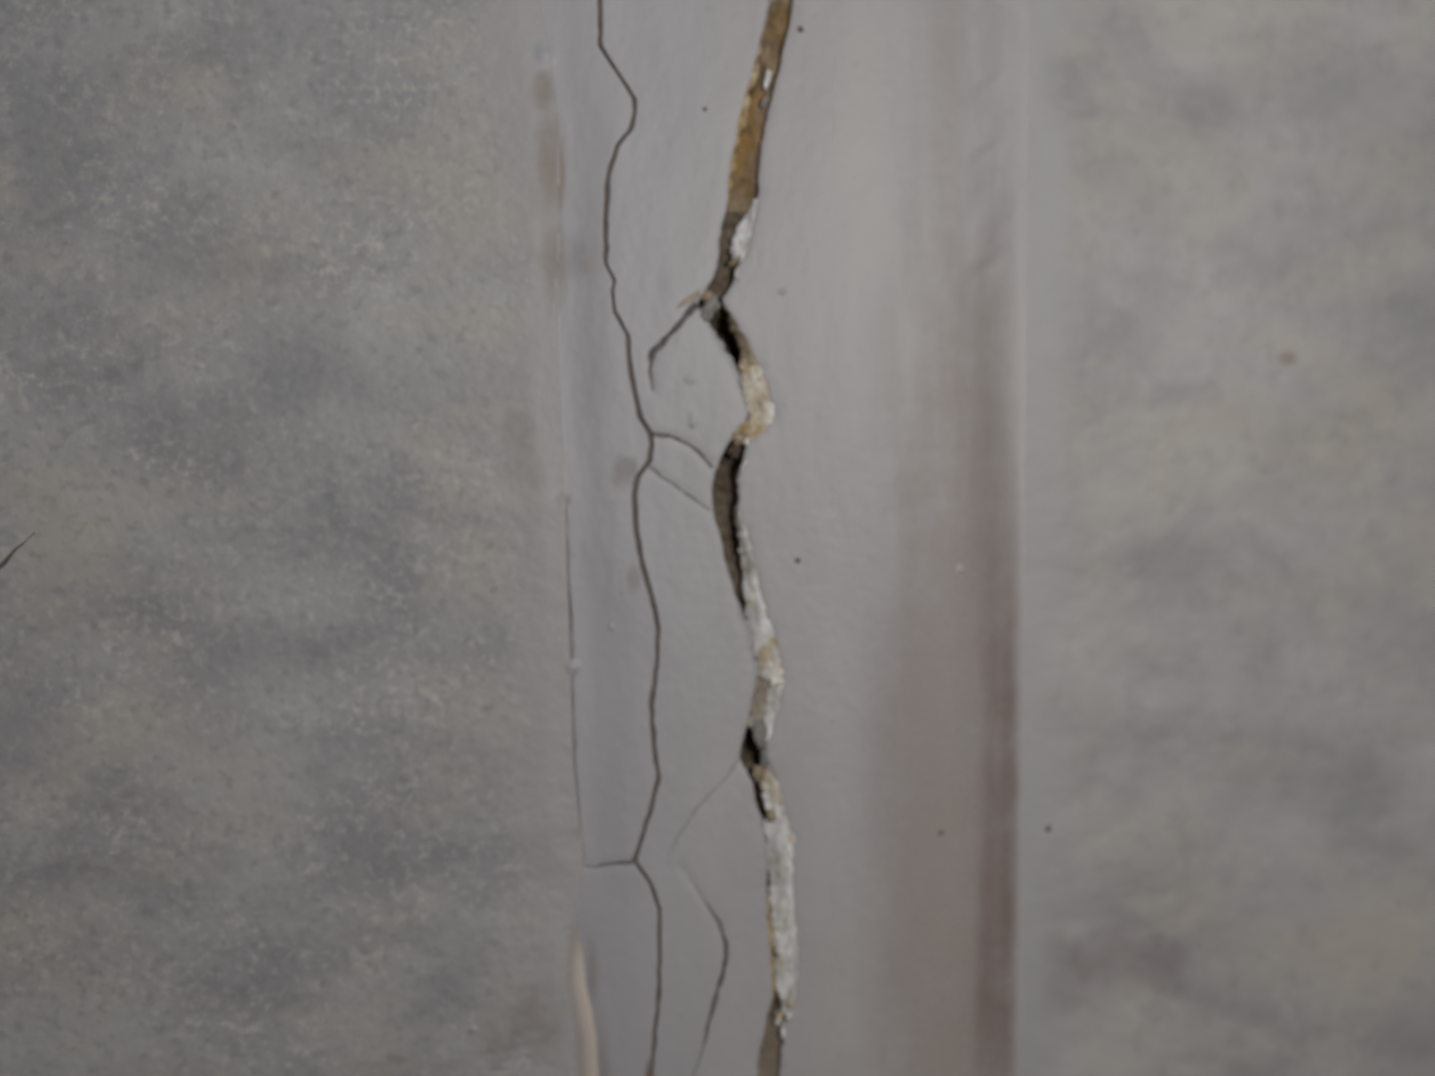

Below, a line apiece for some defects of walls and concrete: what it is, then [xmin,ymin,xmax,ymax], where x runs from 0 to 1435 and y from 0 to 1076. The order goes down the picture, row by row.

crack [597,0,799,1076]